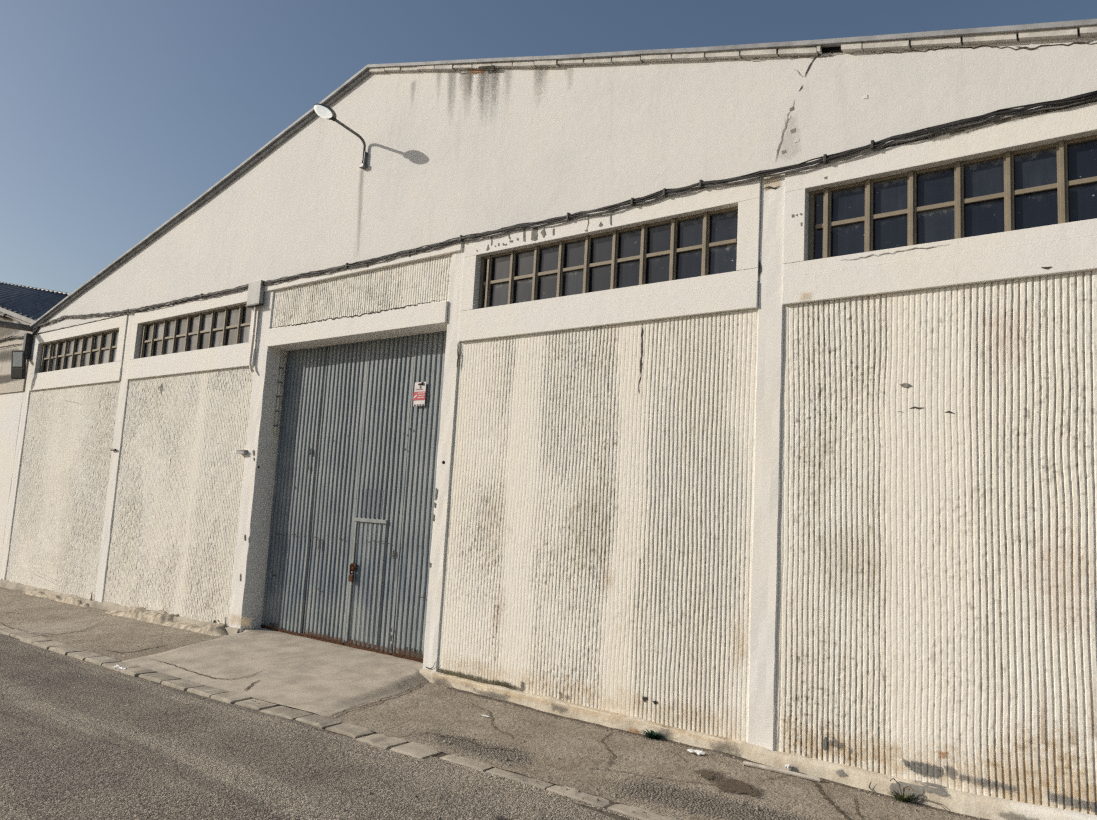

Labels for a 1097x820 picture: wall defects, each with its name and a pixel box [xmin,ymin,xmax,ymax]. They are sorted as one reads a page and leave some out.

crack [721,40,1097,162]
crack [636,324,644,391]
water stain [438,669,524,692]